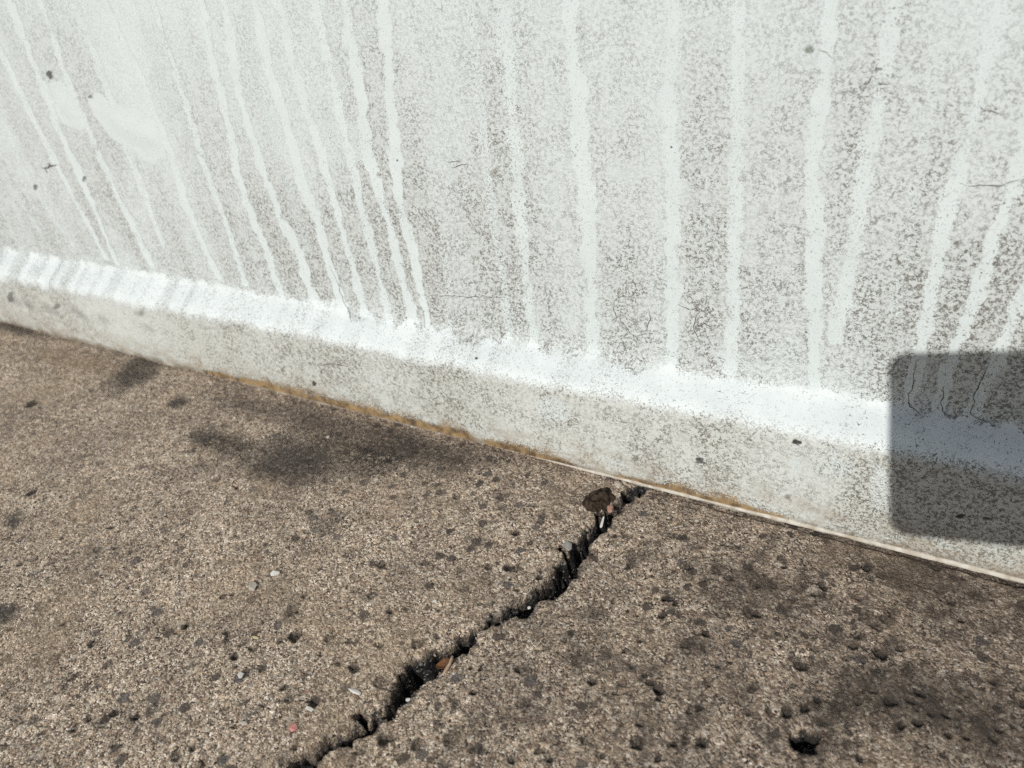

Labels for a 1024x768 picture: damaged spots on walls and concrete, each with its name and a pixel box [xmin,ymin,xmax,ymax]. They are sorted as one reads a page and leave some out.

damp [0,0,1024,511]
crack [276,484,652,768]